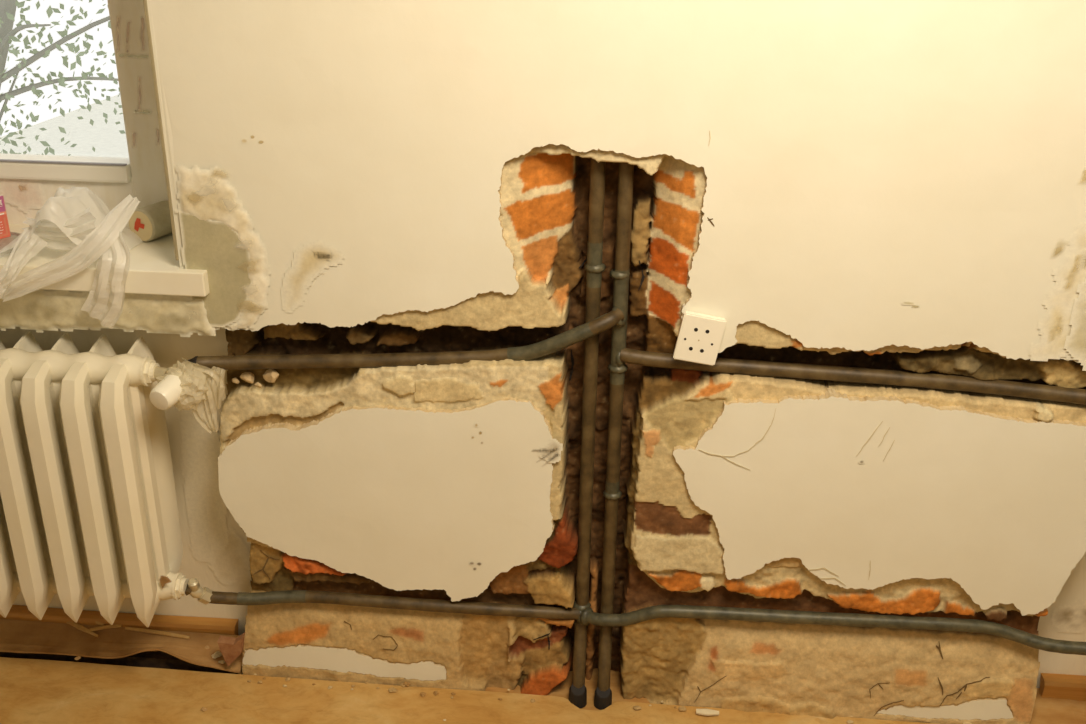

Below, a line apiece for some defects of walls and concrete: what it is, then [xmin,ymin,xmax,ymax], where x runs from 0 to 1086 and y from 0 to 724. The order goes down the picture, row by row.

peeling [174,164,271,330]
spalling [499,144,707,337]
spalling [242,590,518,691]
spalling [631,387,735,574]
spalling [764,557,804,567]
spalling [621,603,1040,724]